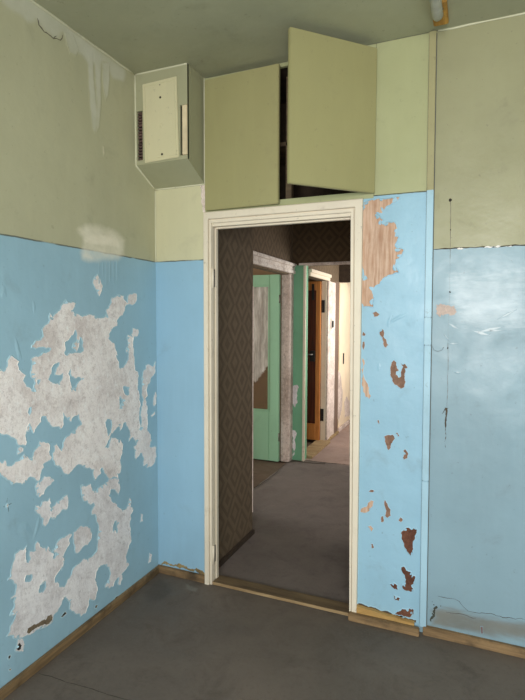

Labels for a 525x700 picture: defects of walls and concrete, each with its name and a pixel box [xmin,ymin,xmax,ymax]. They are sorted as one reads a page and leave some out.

leakage [0,0,129,135]
peeling [362,196,405,317]
flaking render [436,304,456,317]
peeling [361,331,371,400]
peeling [390,360,408,389]
peeling [384,432,400,451]
peeling [0,293,157,672]
peeling [360,489,375,513]
peeling [380,499,418,556]
peeling [357,566,417,623]
crack [439,596,522,619]